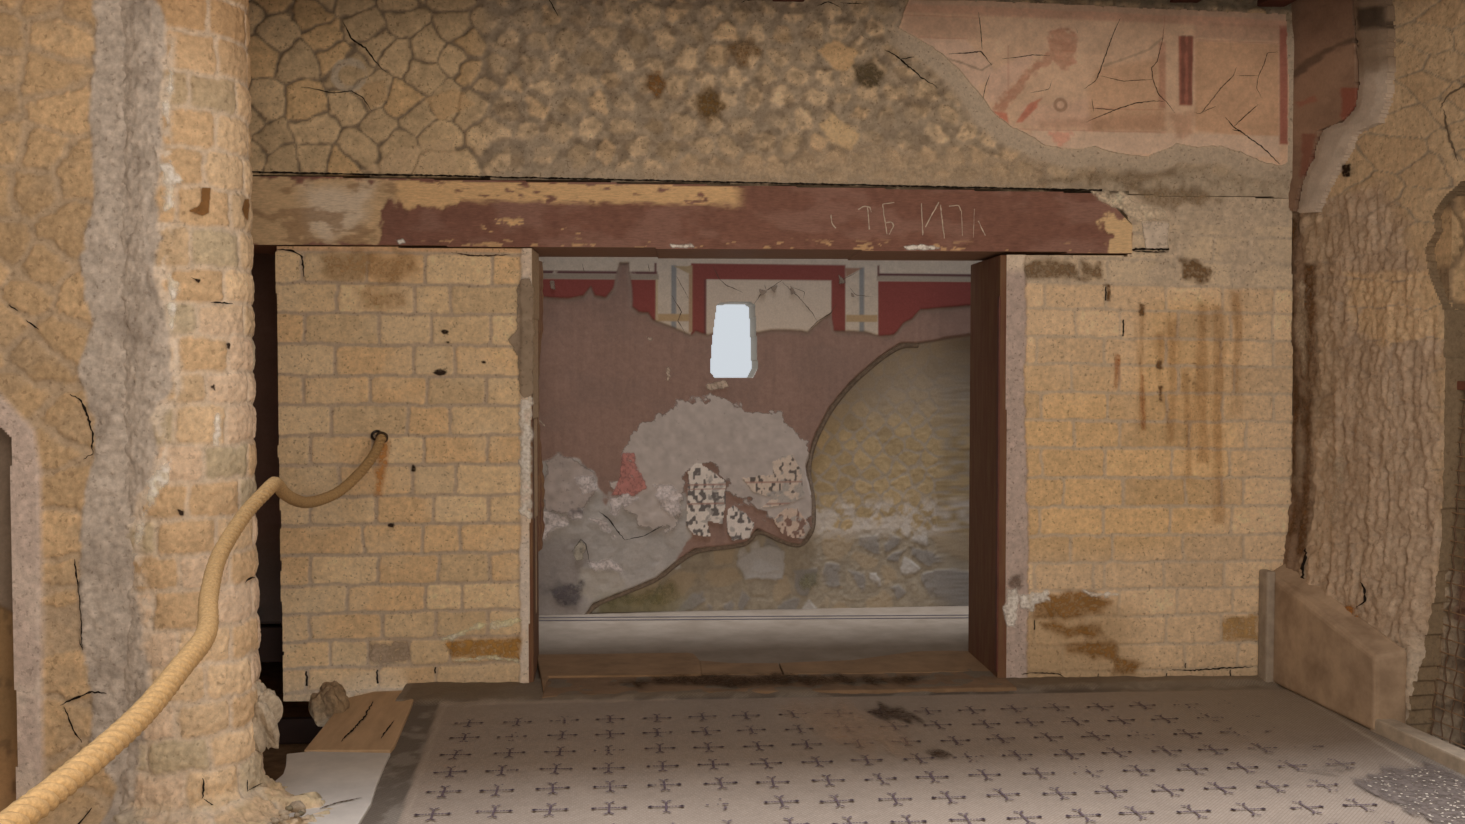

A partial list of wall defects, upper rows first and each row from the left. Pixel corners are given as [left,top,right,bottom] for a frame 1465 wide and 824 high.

crack [952,12,1276,161]
crack [1440,83,1465,161]
spalling [519,393,812,539]
damp [1003,589,1138,673]